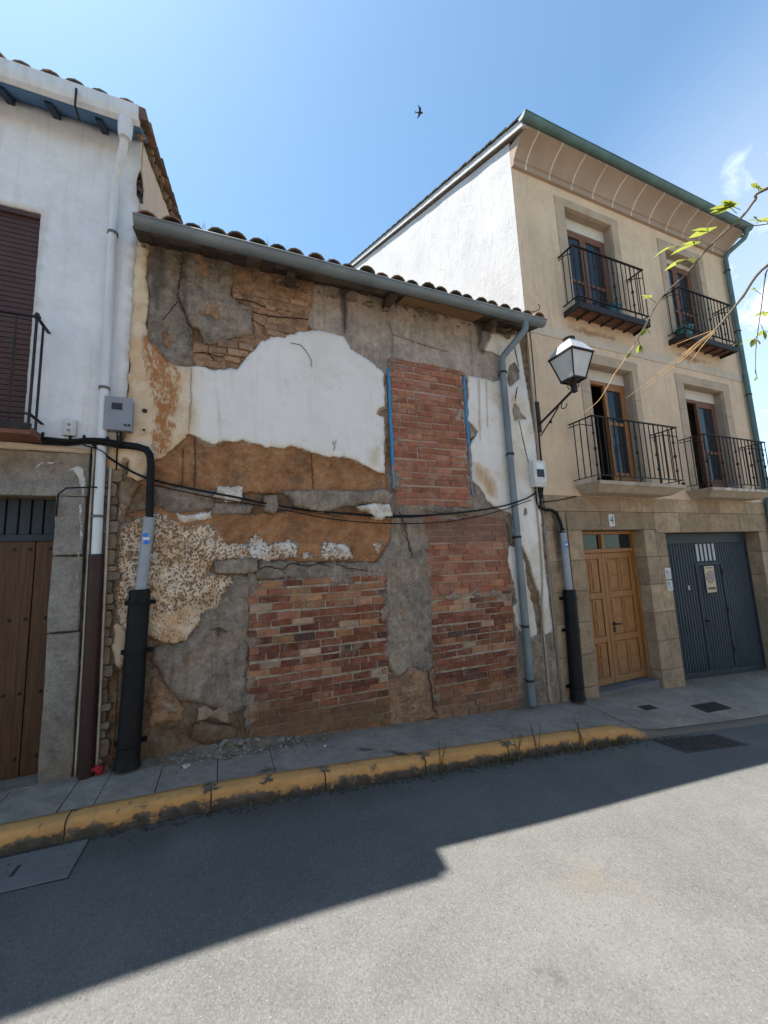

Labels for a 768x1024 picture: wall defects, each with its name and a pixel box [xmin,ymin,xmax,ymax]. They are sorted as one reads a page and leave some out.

crack [163,261,193,346]
flaking render [73,239,471,775]
flaking render [453,327,554,637]